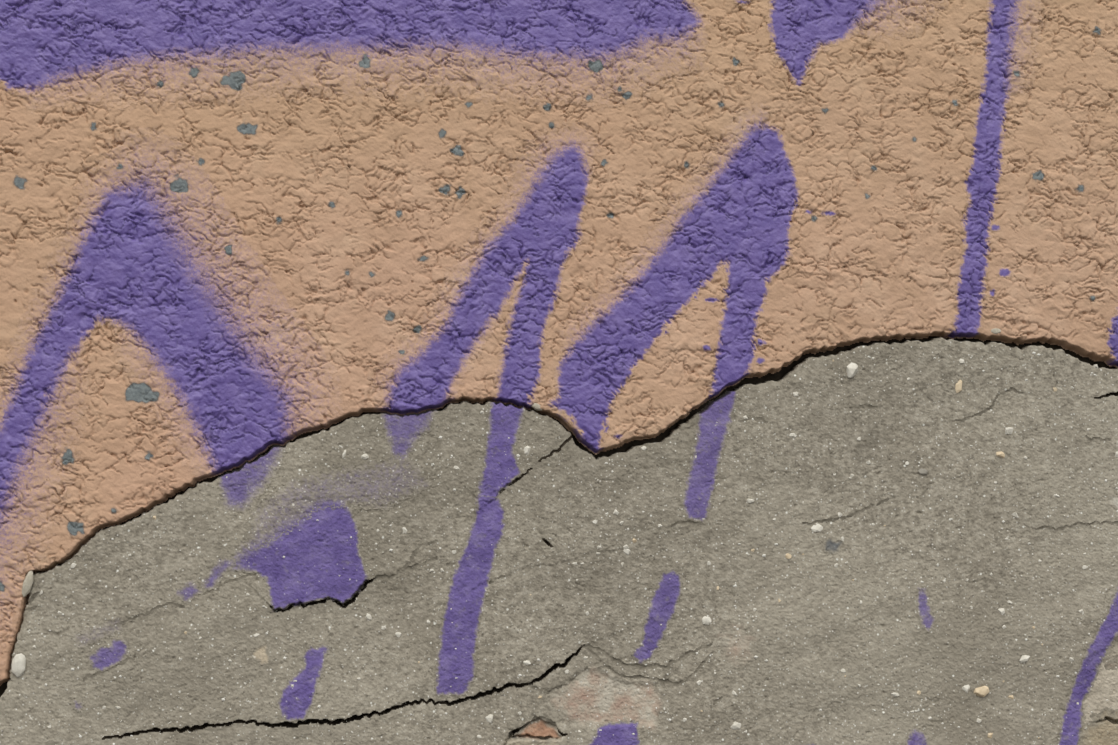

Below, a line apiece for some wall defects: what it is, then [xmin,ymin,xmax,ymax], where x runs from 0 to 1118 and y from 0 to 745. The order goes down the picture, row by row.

crack [421,336,1118,500]
crack [25,412,380,636]
crack [270,539,438,612]
spalling [0,337,1118,745]
crack [0,680,9,697]
crack [83,652,139,682]
crack [102,641,713,740]